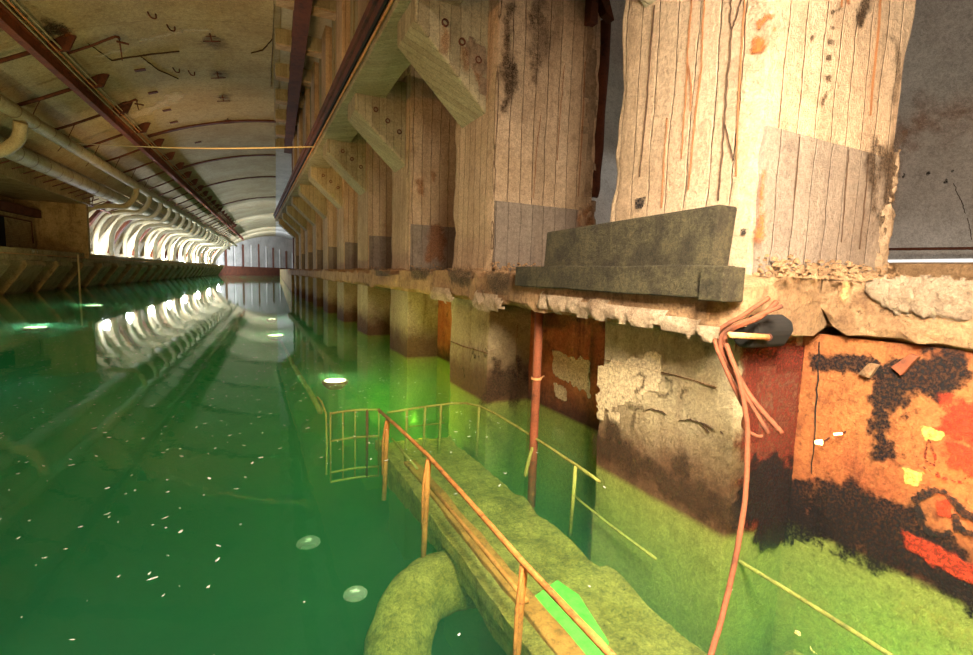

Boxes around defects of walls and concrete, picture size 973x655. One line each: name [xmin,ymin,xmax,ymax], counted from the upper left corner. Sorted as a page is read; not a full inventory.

water stain [499,3,518,112]
water stain [856,0,870,27]
spalling [865,149,973,322]
peeling [552,351,662,425]